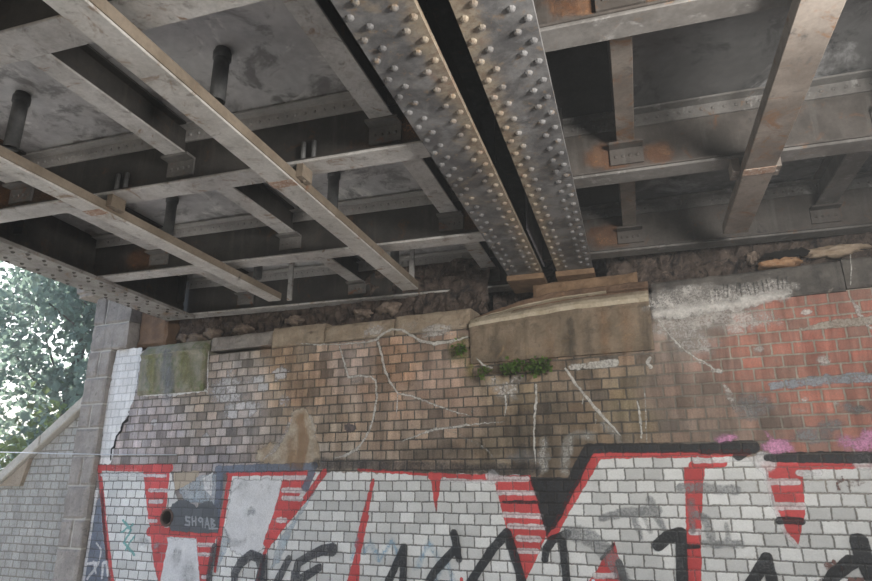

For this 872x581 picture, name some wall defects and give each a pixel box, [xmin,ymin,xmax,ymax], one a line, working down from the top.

water stain [649,281,790,351]
peeling [100,347,290,465]
crack [301,328,496,459]
crack [564,368,620,435]